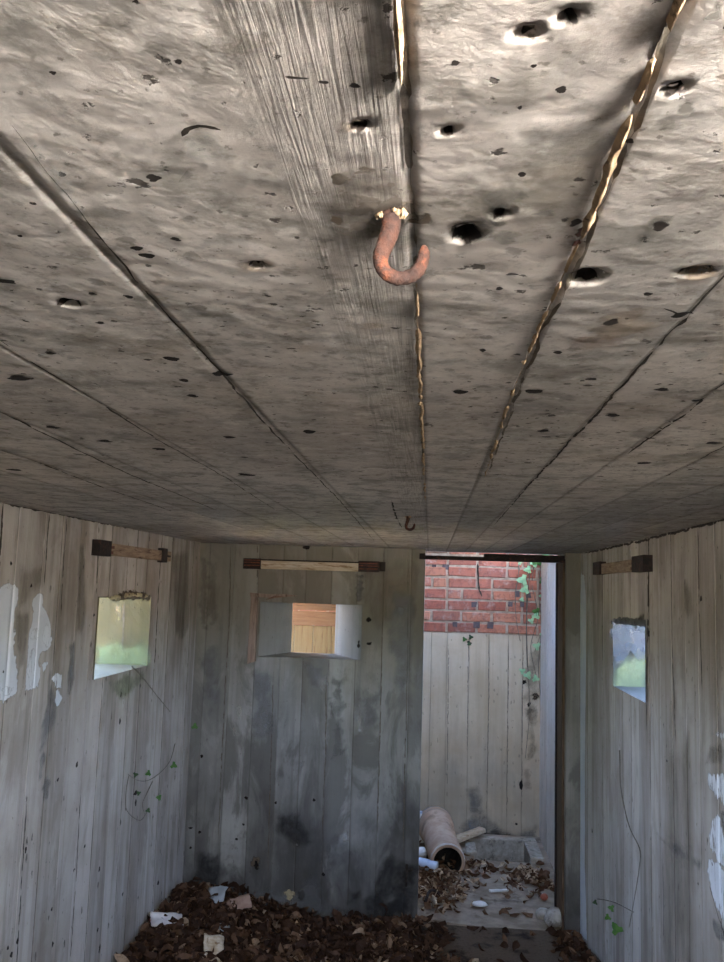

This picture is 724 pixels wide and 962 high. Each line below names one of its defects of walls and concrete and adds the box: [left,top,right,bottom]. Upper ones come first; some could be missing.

crack [494,275,724,525]
peeling [0,583,62,706]
leakage [278,817,309,845]
leakage [355,860,419,917]
peeling [707,814,724,920]
peeling [708,773,724,804]